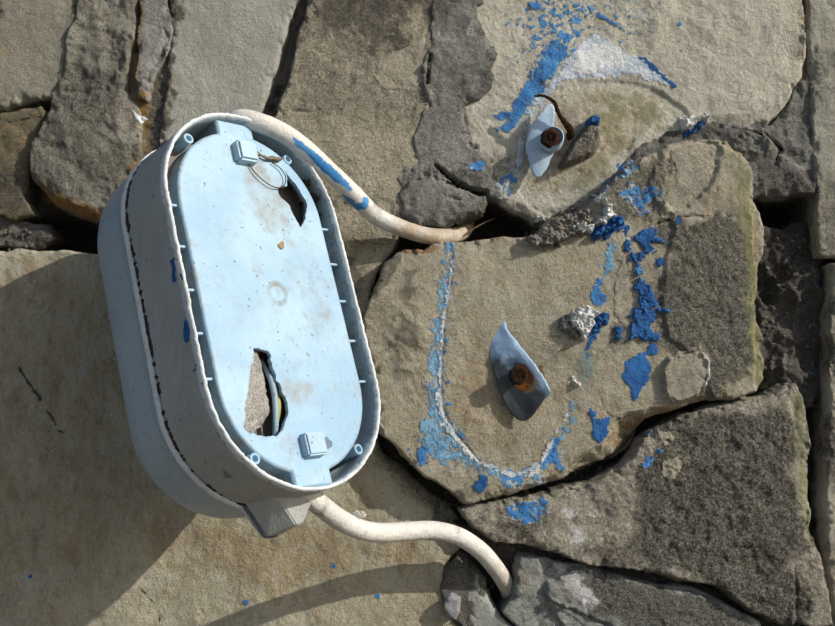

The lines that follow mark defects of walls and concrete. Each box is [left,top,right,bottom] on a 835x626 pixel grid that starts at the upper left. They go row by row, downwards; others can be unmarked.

rust [139,90,148,131]
rust [40,186,102,225]
rust [515,364,545,391]